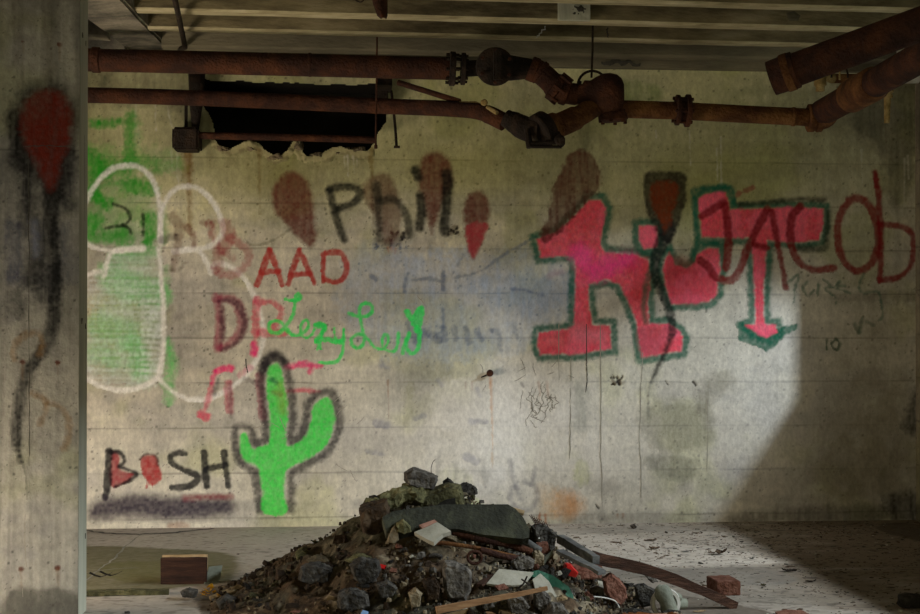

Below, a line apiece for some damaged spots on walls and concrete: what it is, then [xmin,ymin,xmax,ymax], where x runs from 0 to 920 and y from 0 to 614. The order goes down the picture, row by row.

spalling [209,121,369,165]